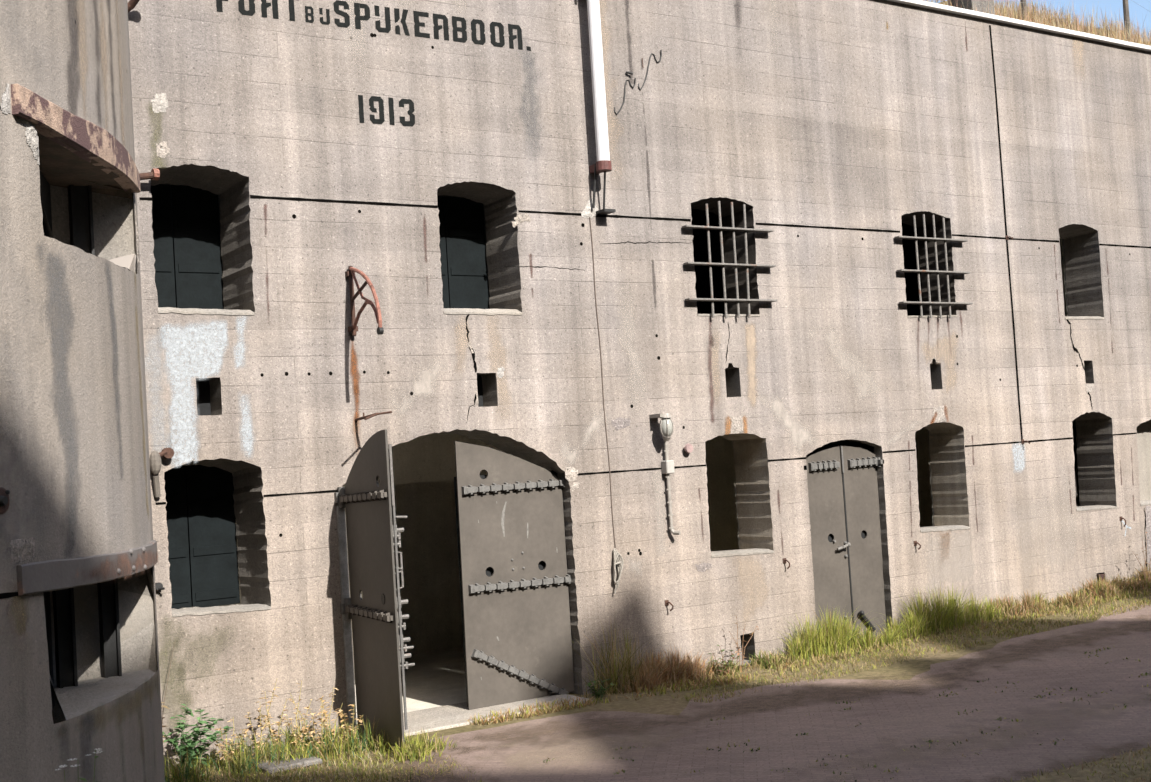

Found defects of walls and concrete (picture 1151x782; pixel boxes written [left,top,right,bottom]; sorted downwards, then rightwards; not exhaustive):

spalling [151,93,168,113]
leakage [162,320,245,466]
leakage [242,401,252,454]
corrosion [351,339,359,422]
crack [466,314,478,423]
crack [1066,319,1094,407]